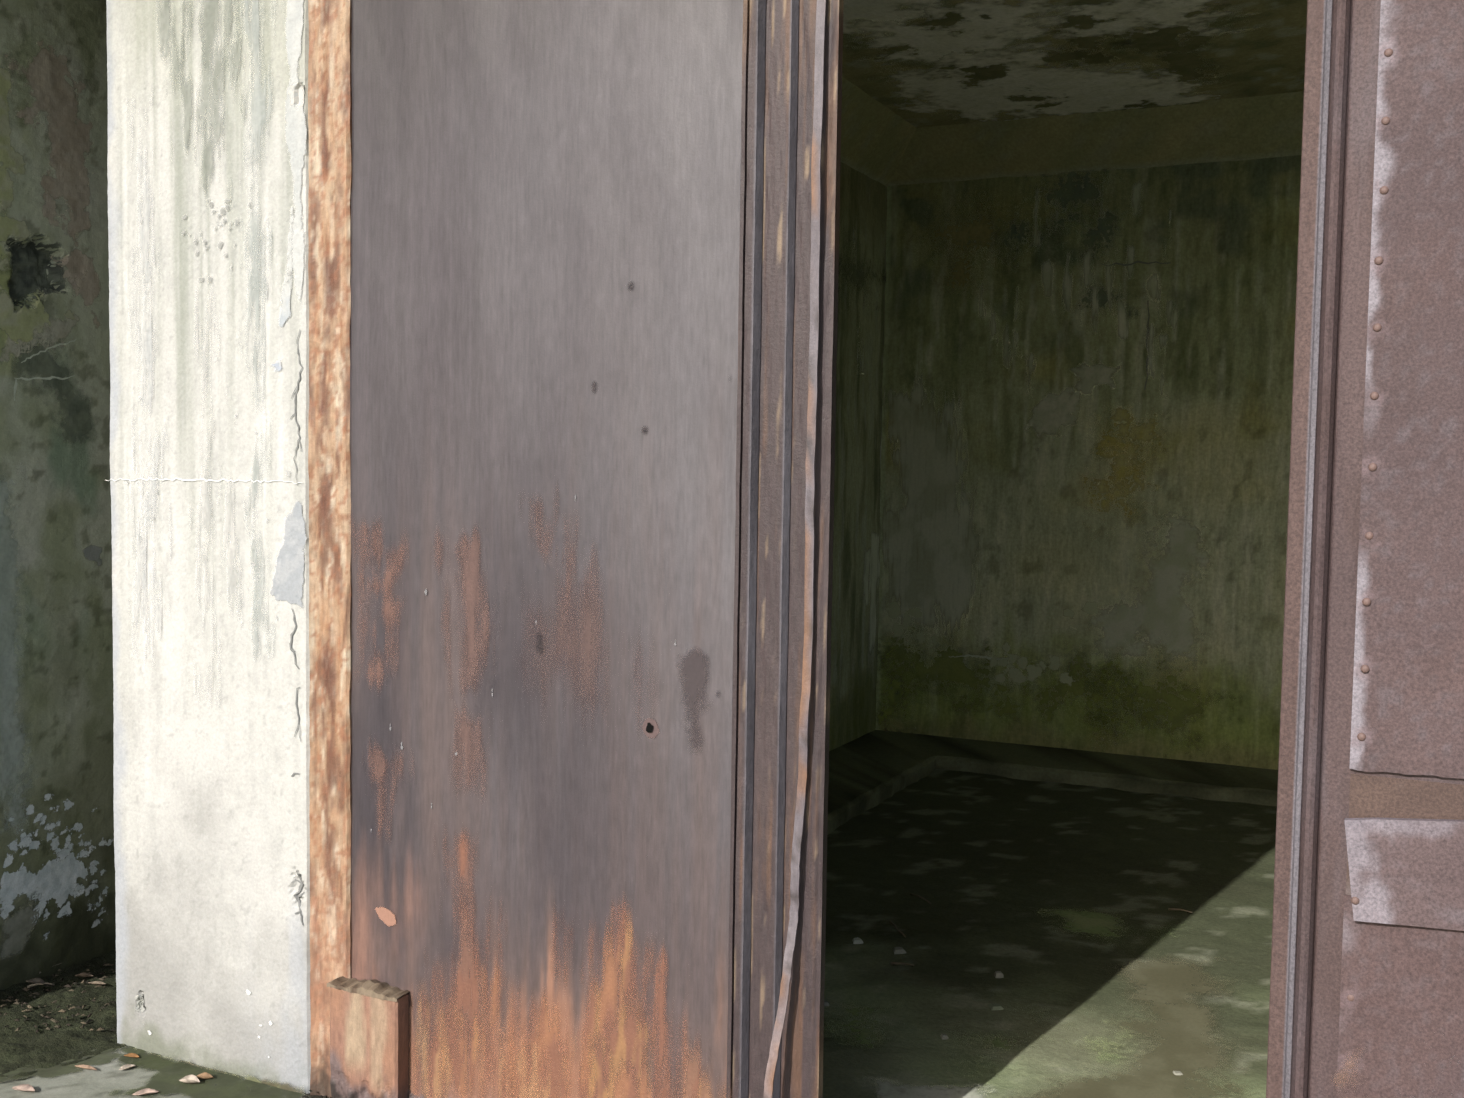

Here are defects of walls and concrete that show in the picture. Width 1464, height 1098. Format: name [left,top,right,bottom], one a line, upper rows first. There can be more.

leakage [919,12,992,36]
leakage [934,52,1009,87]
leakage [1007,88,1067,116]
leakage [1042,5,1229,83]
peeling [0,68,79,362]
leakage [158,0,272,403]
leakage [996,169,1178,392]
leakage [196,457,263,655]
peeling [1,894,39,959]
corrosion [413,836,513,1098]
corrosion [578,909,710,1098]